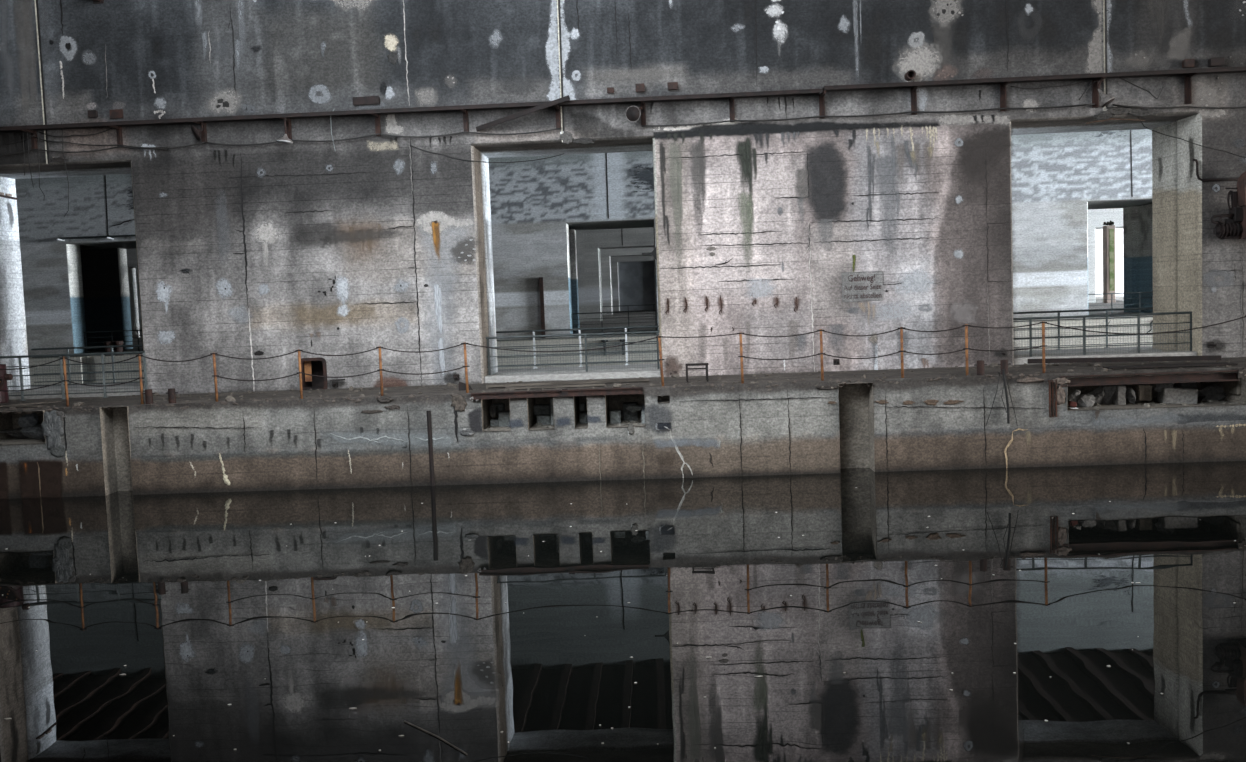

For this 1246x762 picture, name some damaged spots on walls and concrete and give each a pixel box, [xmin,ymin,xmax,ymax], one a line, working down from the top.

damp [546,0,634,139]
damp [1085,0,1113,80]
rust [421,212,449,255]
damp [736,132,799,251]
damp [796,130,875,228]